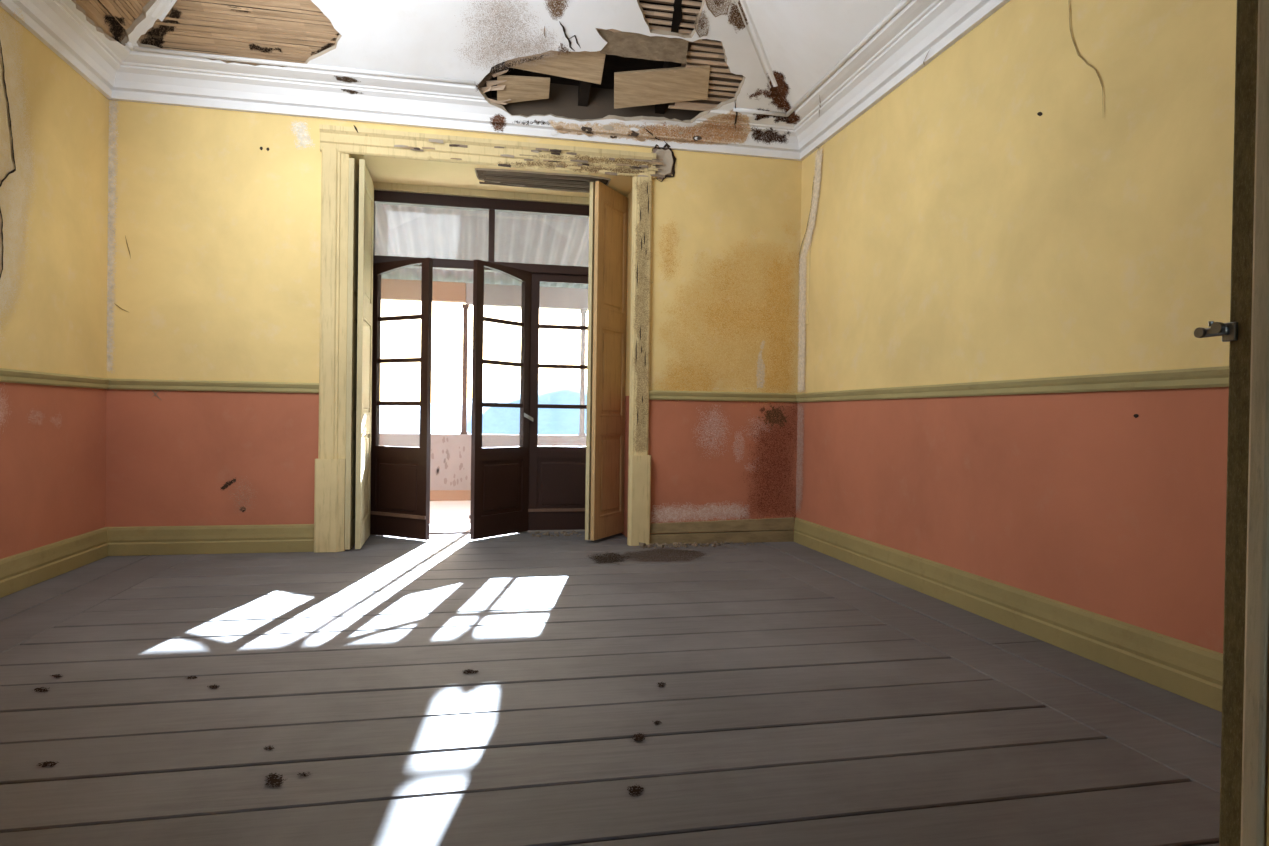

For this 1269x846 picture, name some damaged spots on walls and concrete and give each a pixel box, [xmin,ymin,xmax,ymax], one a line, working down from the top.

crack [0,42,16,278]
flaking render [72,0,342,67]
peeling [394,139,467,160]
flaking render [475,0,752,454]
crack [1069,5,1103,105]
damp [651,218,800,523]